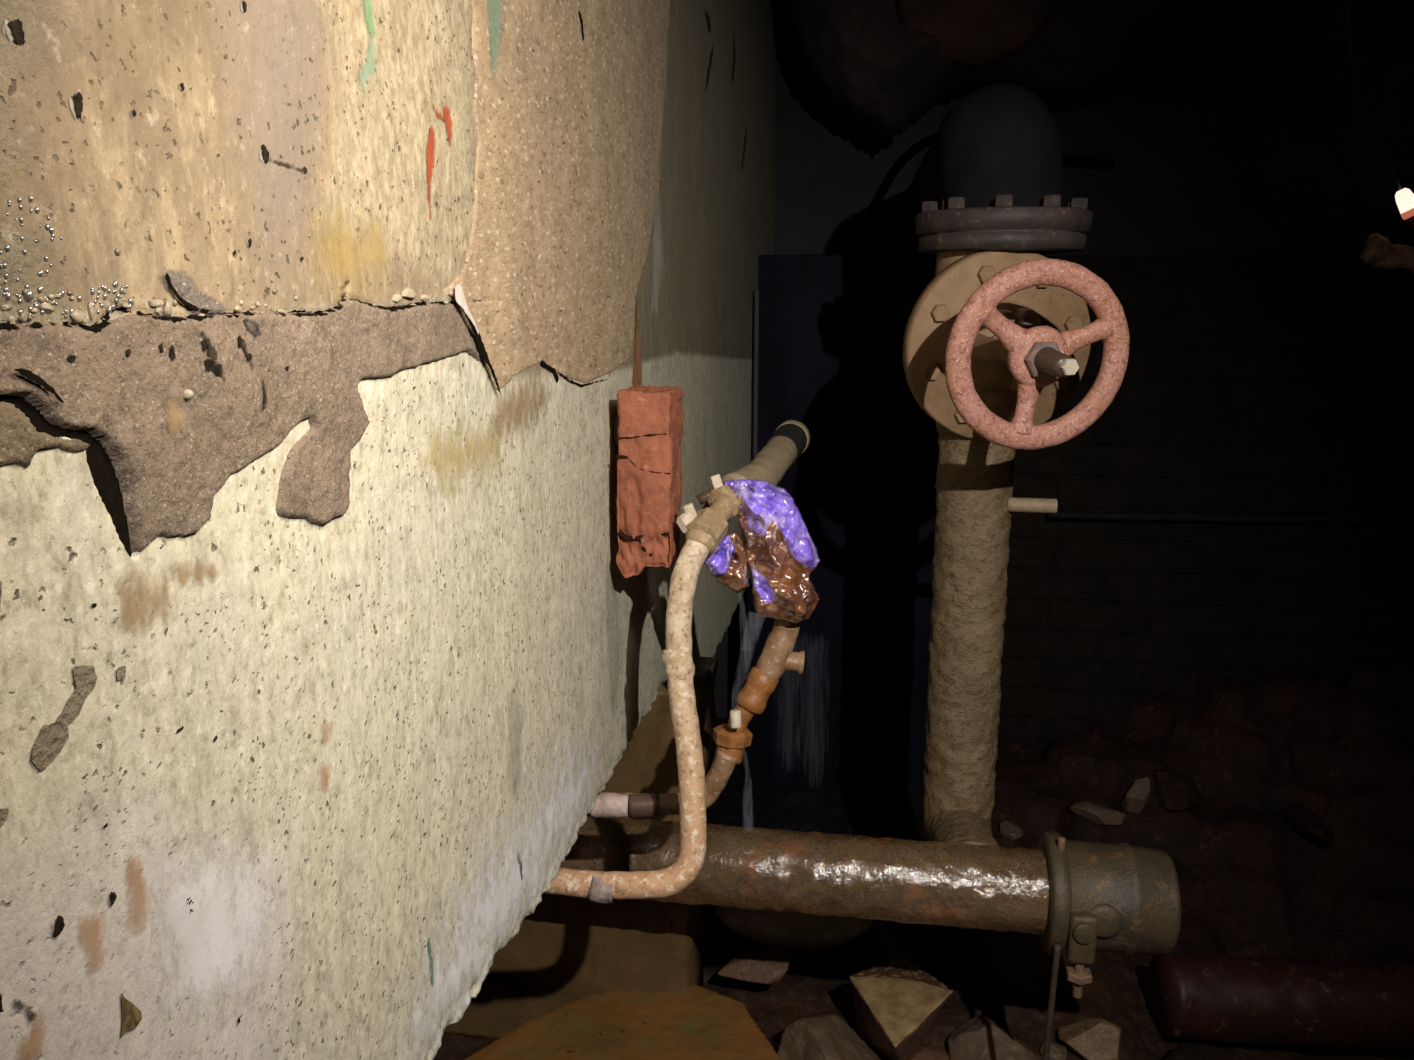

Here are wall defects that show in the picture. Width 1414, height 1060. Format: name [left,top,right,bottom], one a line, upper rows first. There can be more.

spalling [0,270,480,553]
peeling [31,665,97,771]
peeling [117,666,126,680]